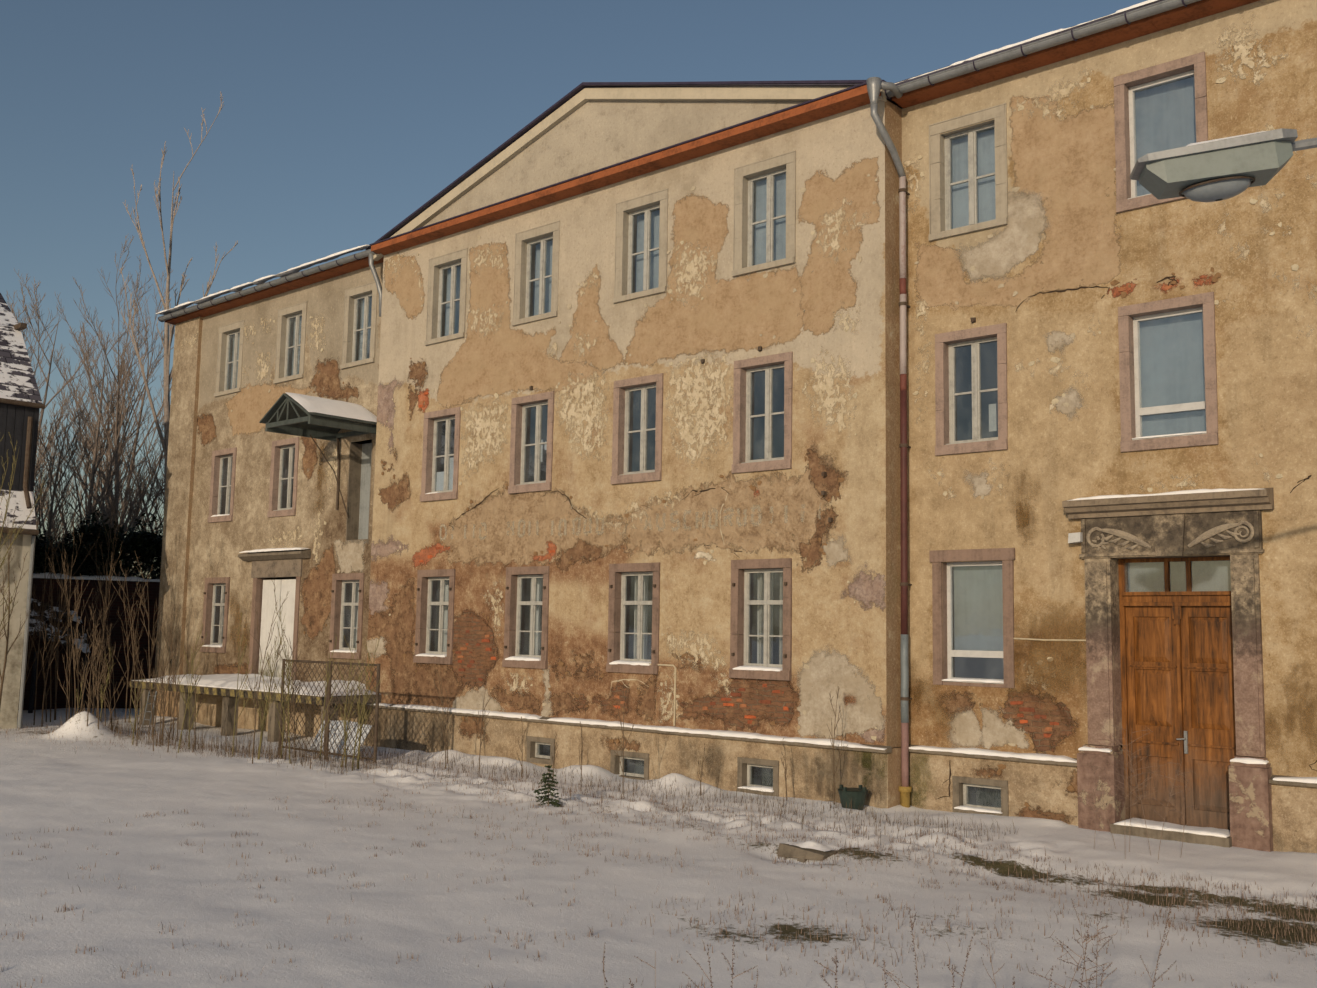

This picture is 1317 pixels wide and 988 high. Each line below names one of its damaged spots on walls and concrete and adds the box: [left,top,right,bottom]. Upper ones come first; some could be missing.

peeling [377,157,881,512]
crack [1016,286,1110,311]
flaking render [1157,267,1221,293]
crack [682,483,742,556]
flaking render [367,448,847,733]
peeling [843,565,886,611]
flaking render [937,690,983,720]
flaking render [1000,657,1078,755]